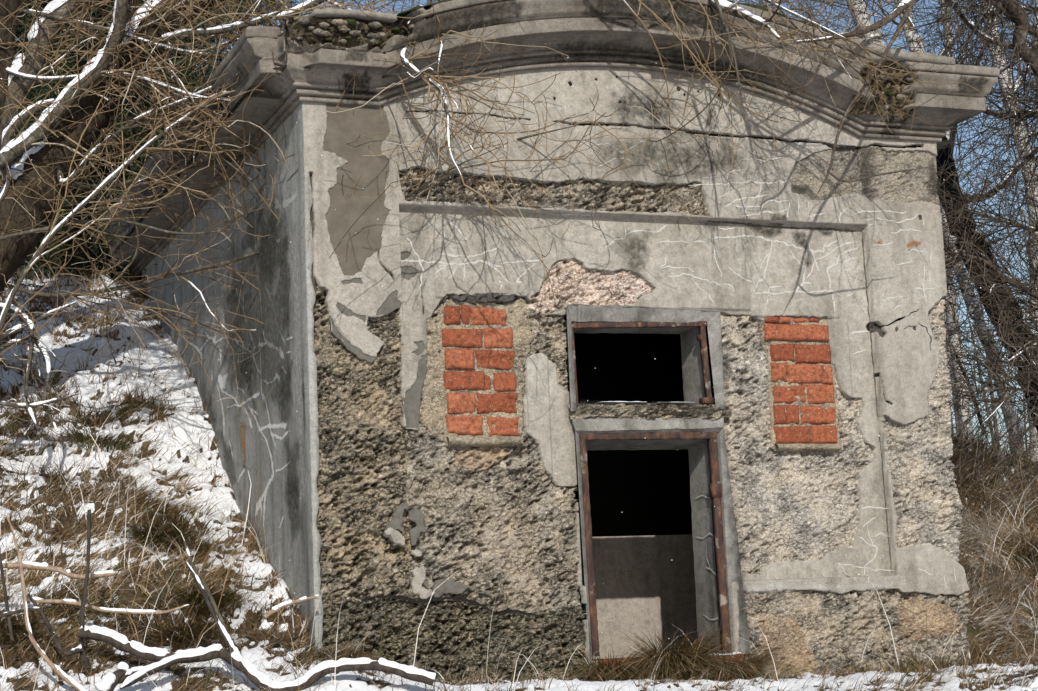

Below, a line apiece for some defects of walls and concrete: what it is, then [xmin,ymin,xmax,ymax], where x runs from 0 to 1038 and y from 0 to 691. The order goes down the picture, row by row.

crack [155,246,293,528]
leakage [211,182,310,528]
crack [385,221,545,314]
spalling [313,259,653,683]
peeling [323,103,707,285]
crack [560,122,956,591]
spalling [713,312,873,575]
spalling [791,146,940,205]
spalling [884,297,963,562]
spalling [738,588,971,678]